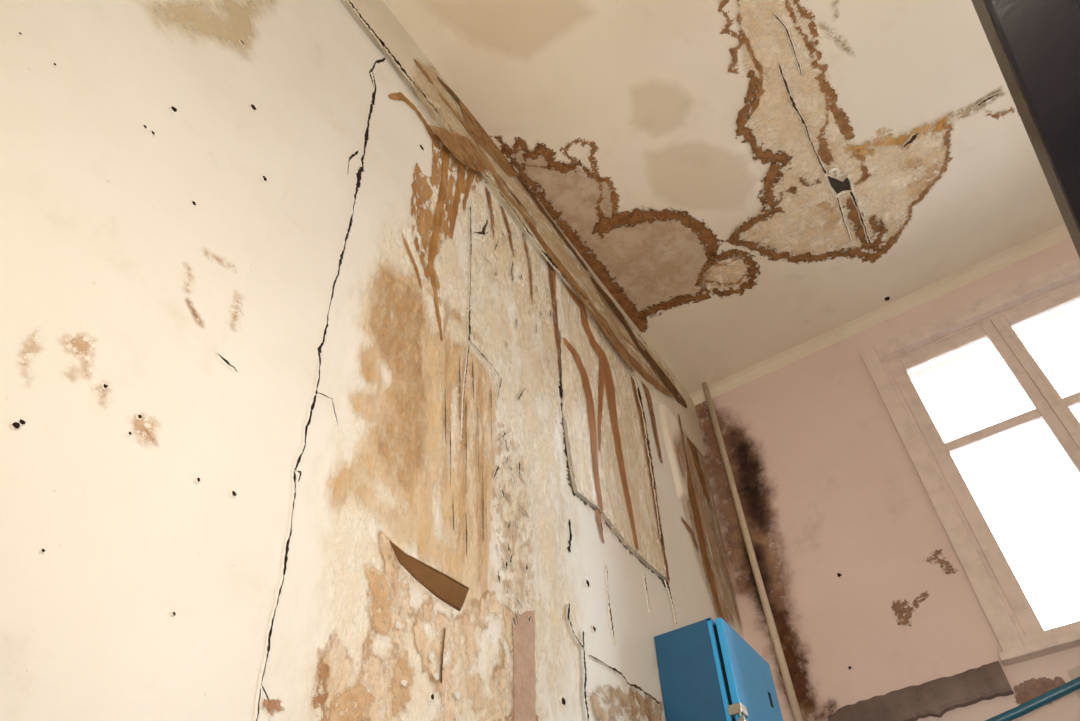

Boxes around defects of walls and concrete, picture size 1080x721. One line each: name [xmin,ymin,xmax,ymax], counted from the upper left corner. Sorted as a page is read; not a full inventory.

crack [974,91,1002,108]
crack [772,13,871,243]
crack [902,132,919,148]
spalling [822,167,854,198]
crack [253,0,456,721]
leakage [388,0,955,721]
peeling [313,188,569,721]
crack [557,331,677,721]
spalling [926,549,957,574]
spalling [892,591,929,626]
peeling [262,699,283,715]
peeling [590,685,664,721]